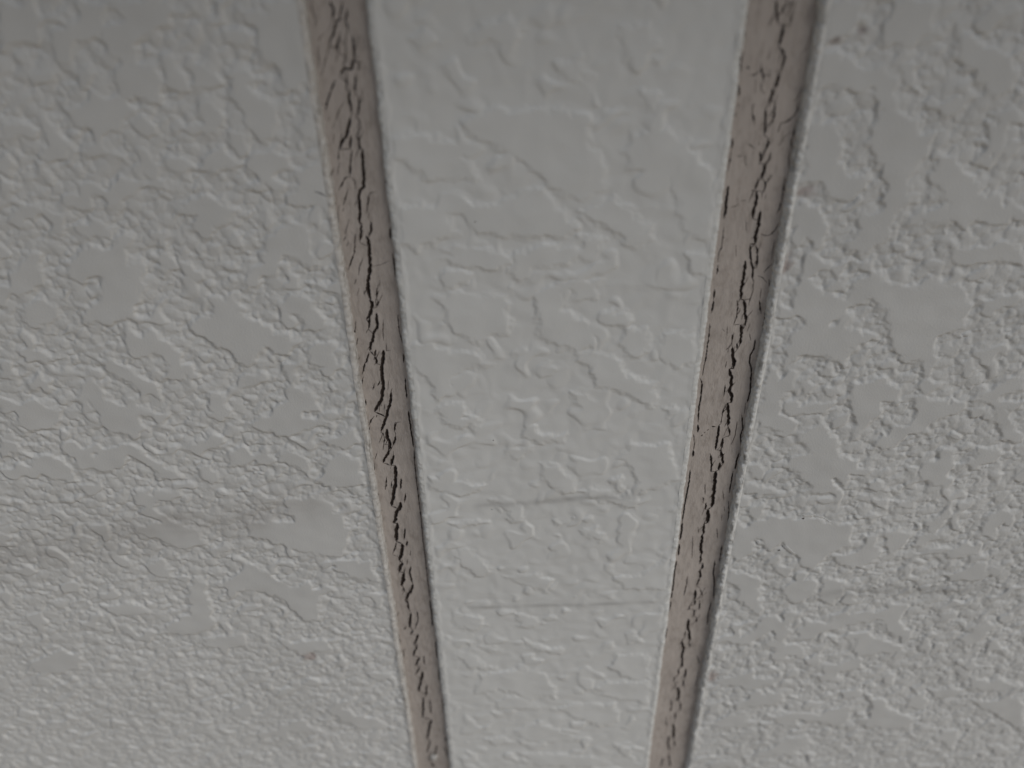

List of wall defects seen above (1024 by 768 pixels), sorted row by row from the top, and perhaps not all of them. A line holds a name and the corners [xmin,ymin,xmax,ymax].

crack [311,0,448,768]
crack [659,0,812,768]